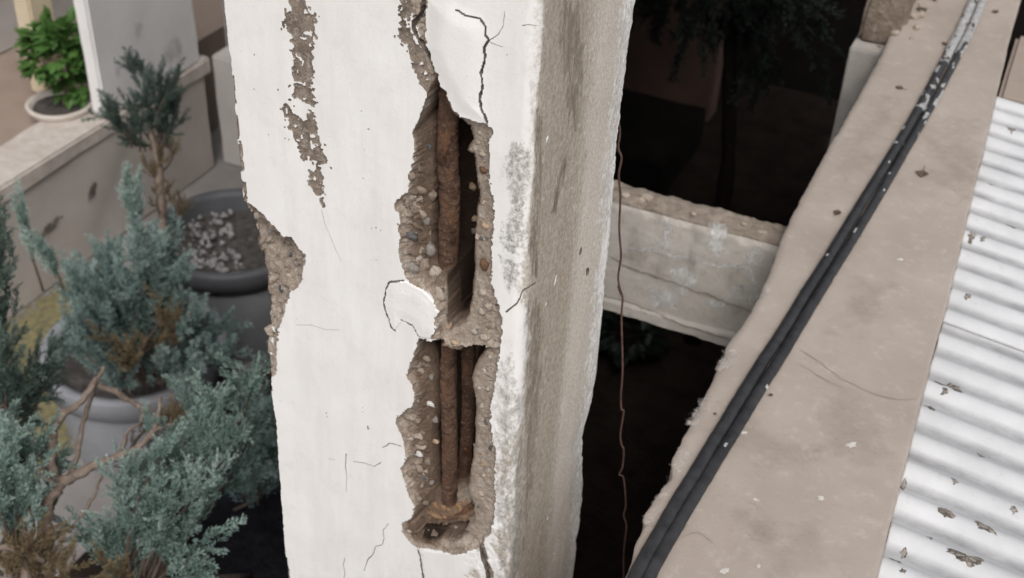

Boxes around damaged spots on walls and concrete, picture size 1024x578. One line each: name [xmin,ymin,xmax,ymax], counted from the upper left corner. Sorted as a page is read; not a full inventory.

peeling [277,0,332,208]
crack [455,9,538,124]
spalling [232,75,306,391]
crack [383,279,420,337]
spalling [383,0,529,578]